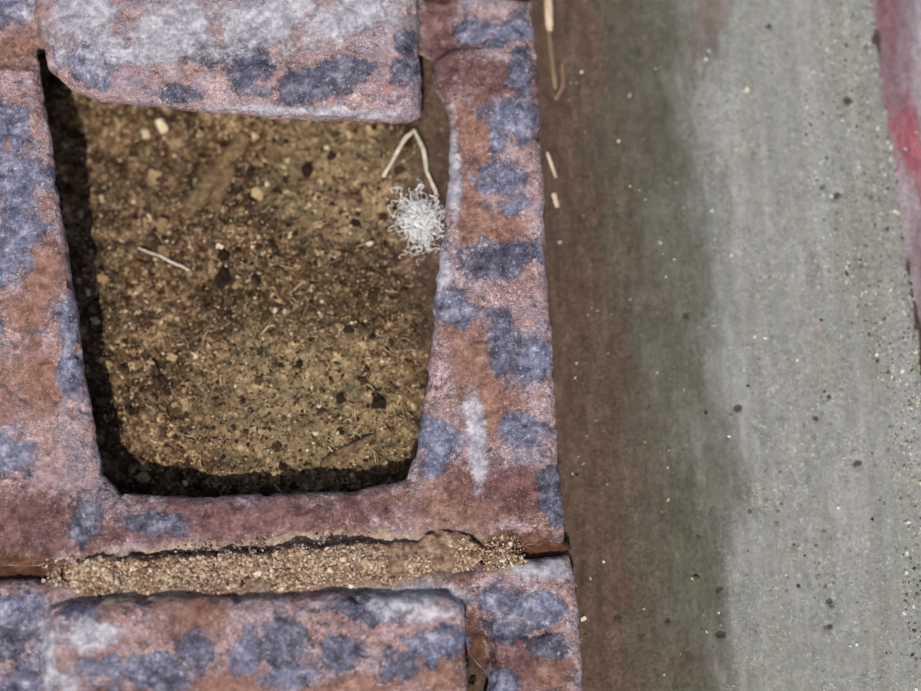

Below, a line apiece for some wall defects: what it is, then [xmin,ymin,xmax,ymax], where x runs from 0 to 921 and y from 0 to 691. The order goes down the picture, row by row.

rust [0,0,715,691]